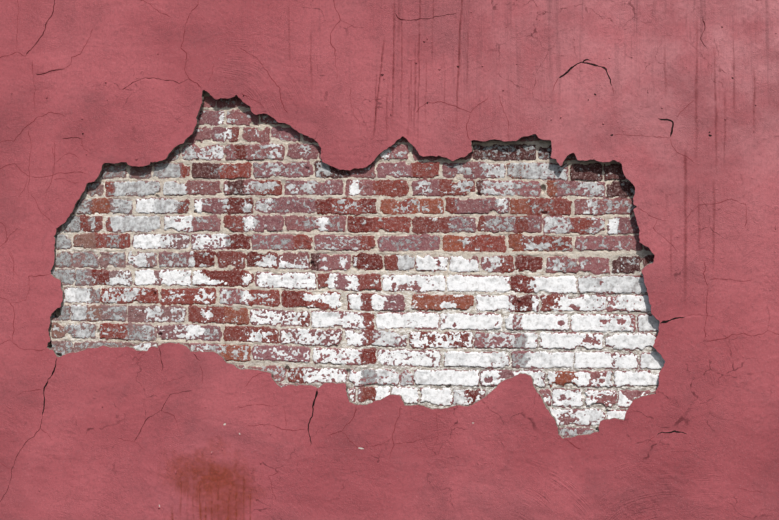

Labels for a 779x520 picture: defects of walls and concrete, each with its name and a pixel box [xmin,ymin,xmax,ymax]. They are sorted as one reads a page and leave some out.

crack [0,0,93,224]
crack [124,5,214,89]
crack [552,59,614,93]
crack [0,222,57,500]
crack [240,373,439,459]
spalling [47,90,665,438]